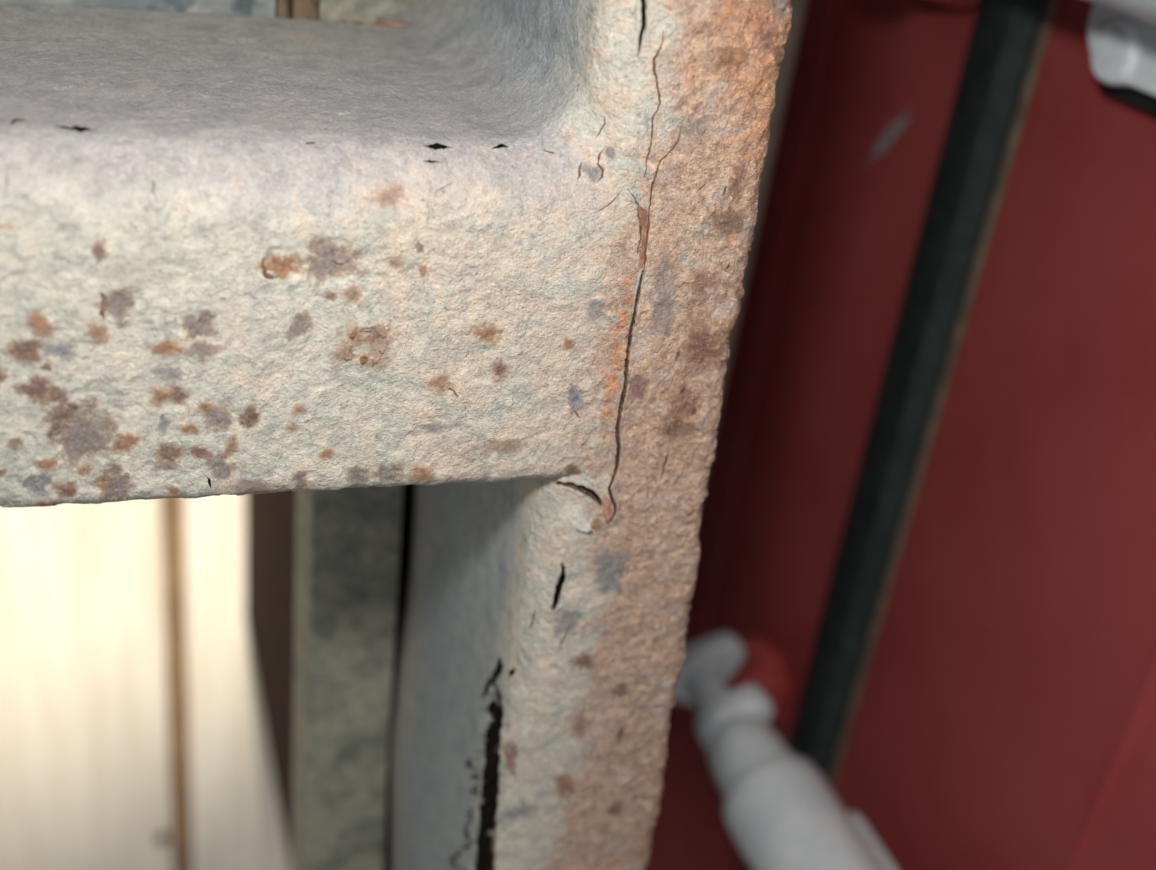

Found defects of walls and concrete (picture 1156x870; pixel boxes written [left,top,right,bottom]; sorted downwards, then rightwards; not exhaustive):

rust [260,235,361,300]
crack [557,0,685,524]
rust [153,341,181,355]
rust [344,326,388,365]
rust [0,312,76,437]
rust [153,386,189,406]
rust [239,405,259,428]
rust [113,434,139,450]
rust [157,444,211,461]
rust [38,467,111,507]
crack [530,566,570,650]
crack [448,658,535,870]